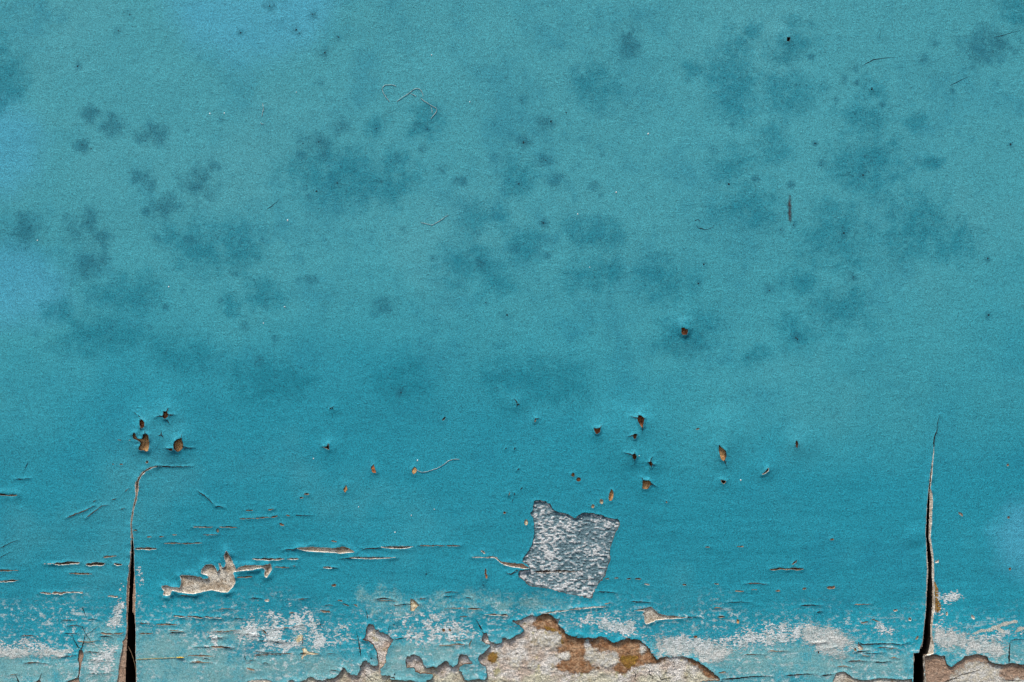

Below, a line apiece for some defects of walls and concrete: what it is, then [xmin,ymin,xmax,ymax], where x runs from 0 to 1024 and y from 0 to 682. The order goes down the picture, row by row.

damp [678,11,984,371]
crack [0,432,311,682]
peeling [158,547,276,600]
peeling [470,488,621,601]
crack [910,419,939,682]
damp [0,567,144,682]
damp [139,600,361,682]
peeling [245,604,723,682]
damp [353,583,917,682]
peeling [852,634,920,653]
peeling [831,652,1024,682]
damp [933,590,1024,664]